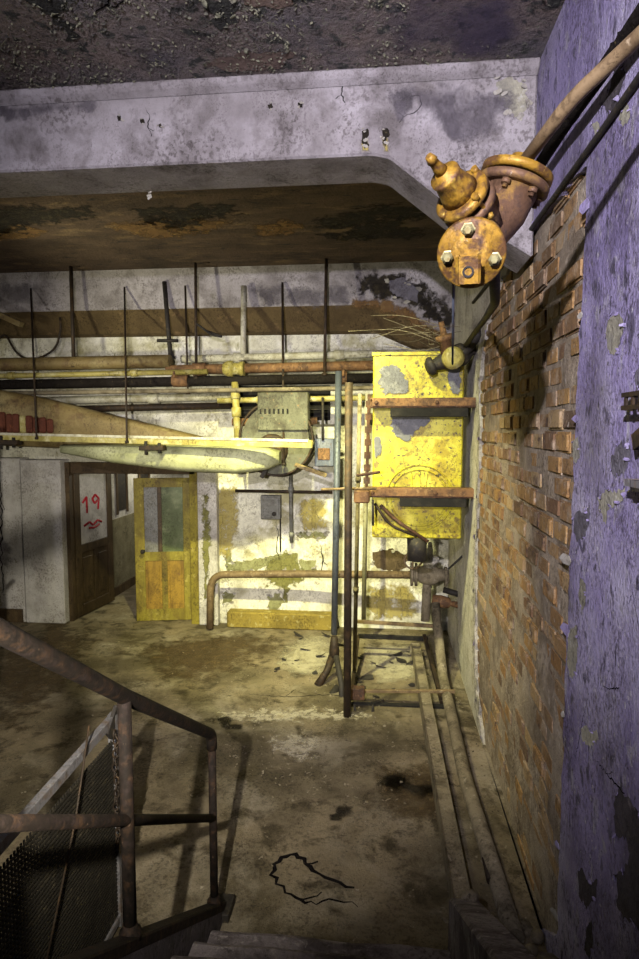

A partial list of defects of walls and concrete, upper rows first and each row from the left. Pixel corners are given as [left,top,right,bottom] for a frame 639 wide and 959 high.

water stain [392,90,512,139]
water stain [201,487,239,599]
water stain [265,550,304,603]
water stain [300,499,328,537]
spalling [447,174,631,934]
crack [269,852,358,907]
peeling [578,868,597,959]
peeling [612,787,639,931]